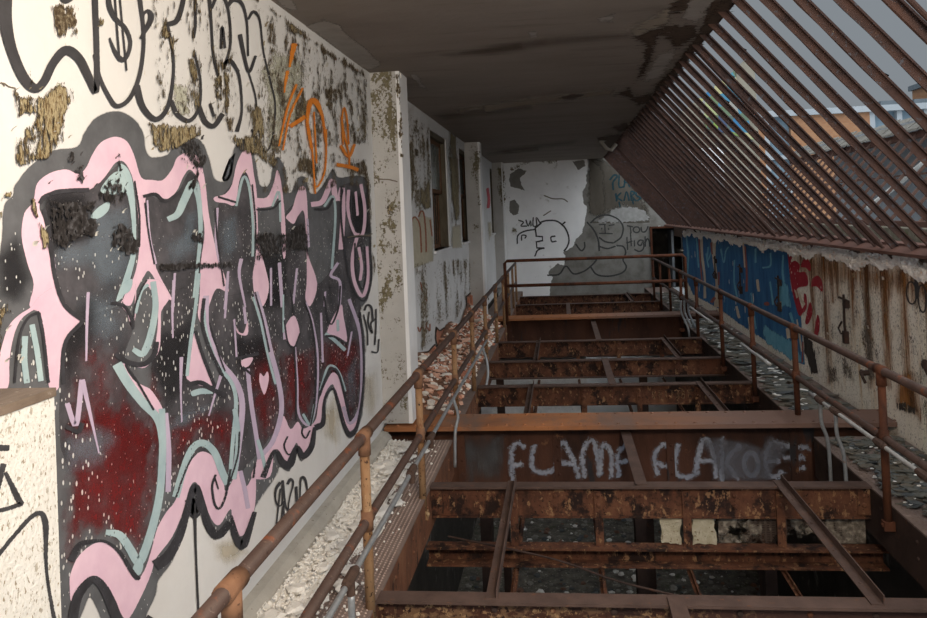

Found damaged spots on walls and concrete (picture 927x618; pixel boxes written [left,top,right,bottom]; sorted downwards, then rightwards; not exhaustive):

peeling [11,71,74,167]
peeling [146,0,372,223]
peeling [32,151,140,255]
peeling [549,158,666,296]
rust [800,255,927,421]